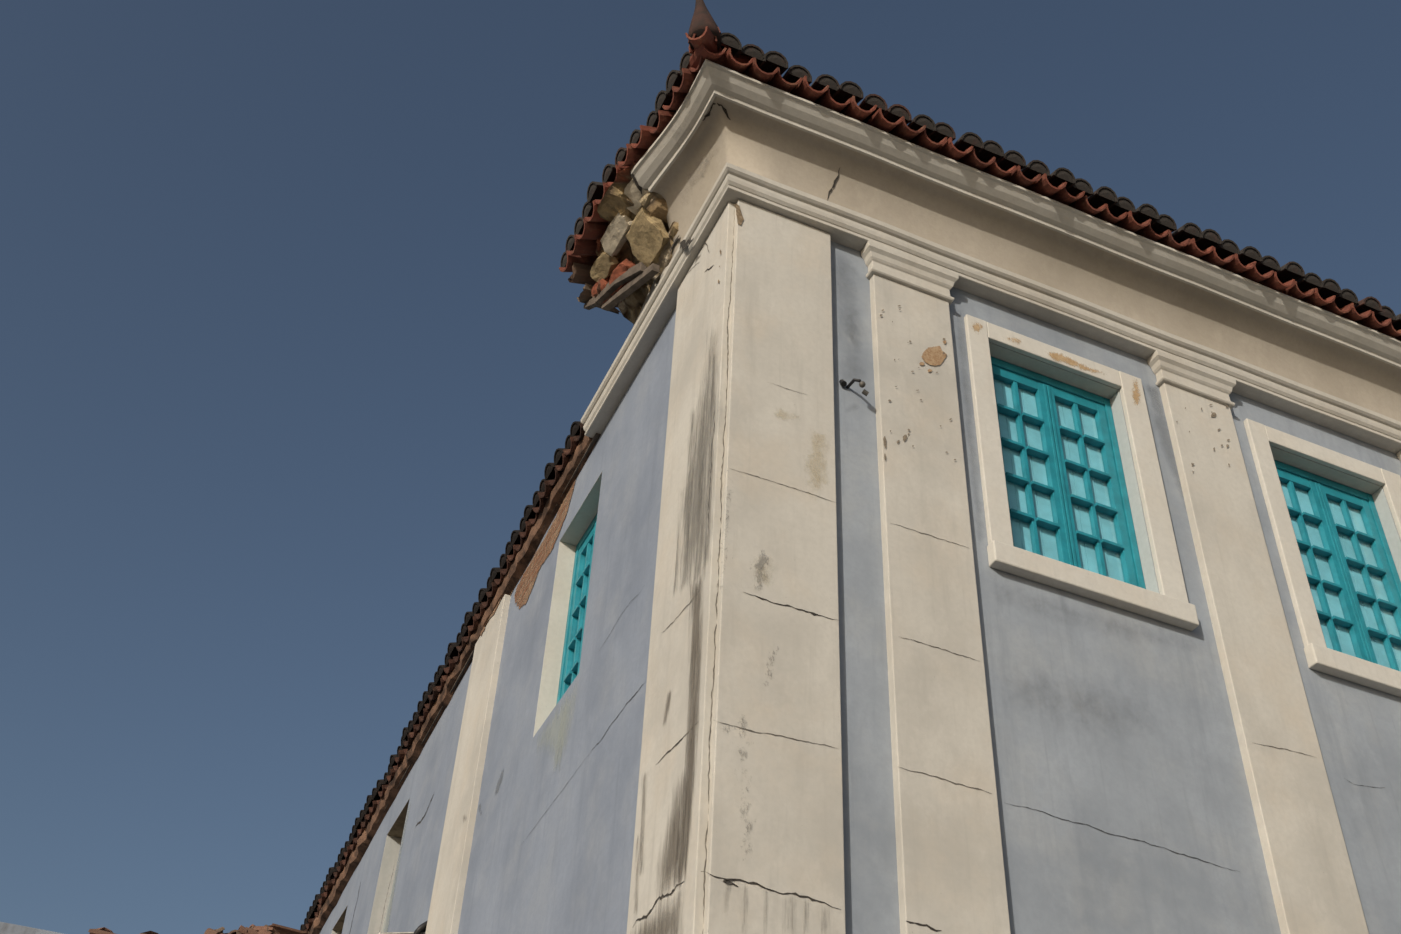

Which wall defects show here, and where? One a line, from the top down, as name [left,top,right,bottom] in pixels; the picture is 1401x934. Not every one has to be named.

flaking render [590,162,679,324]
leakage [674,364,714,586]
flaking render [480,479,576,635]
crack [633,208,841,934]
leakage [662,583,700,887]
crack [900,767,1231,870]
leakage [639,898,679,934]